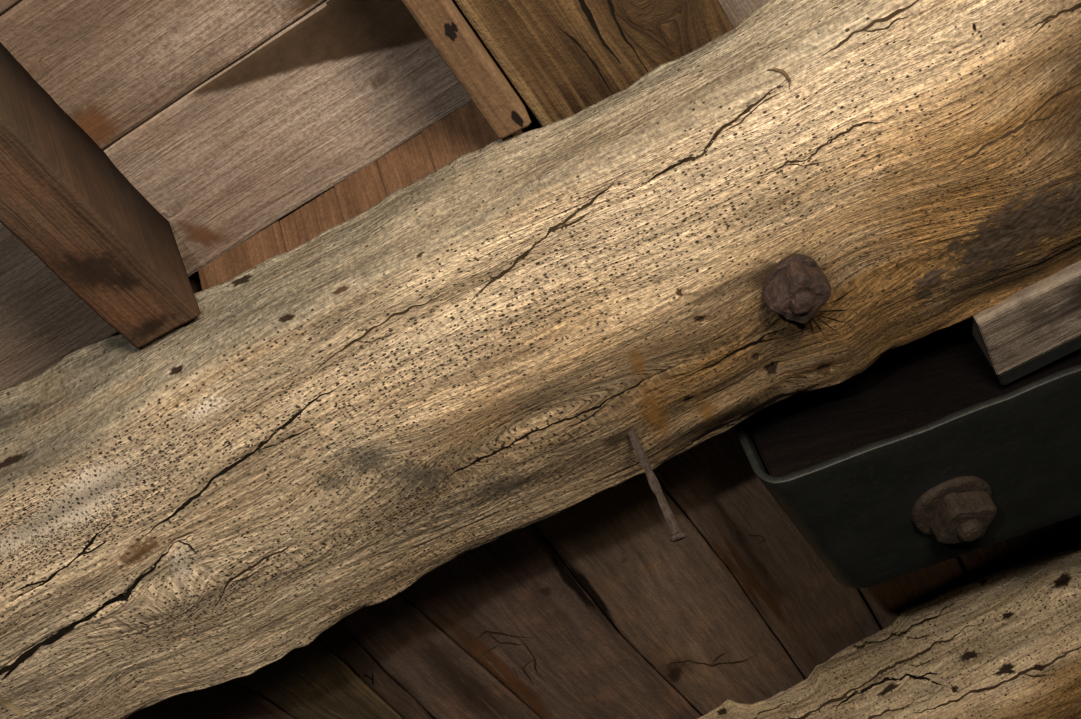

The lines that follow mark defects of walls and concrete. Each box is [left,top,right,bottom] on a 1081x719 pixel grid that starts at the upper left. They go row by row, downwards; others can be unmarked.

crack [560,0,648,91]
crack [822,0,919,56]
crack [1027,3,1081,37]
crack [0,79,787,685]
crack [431,287,856,491]
crack [754,597,1081,719]